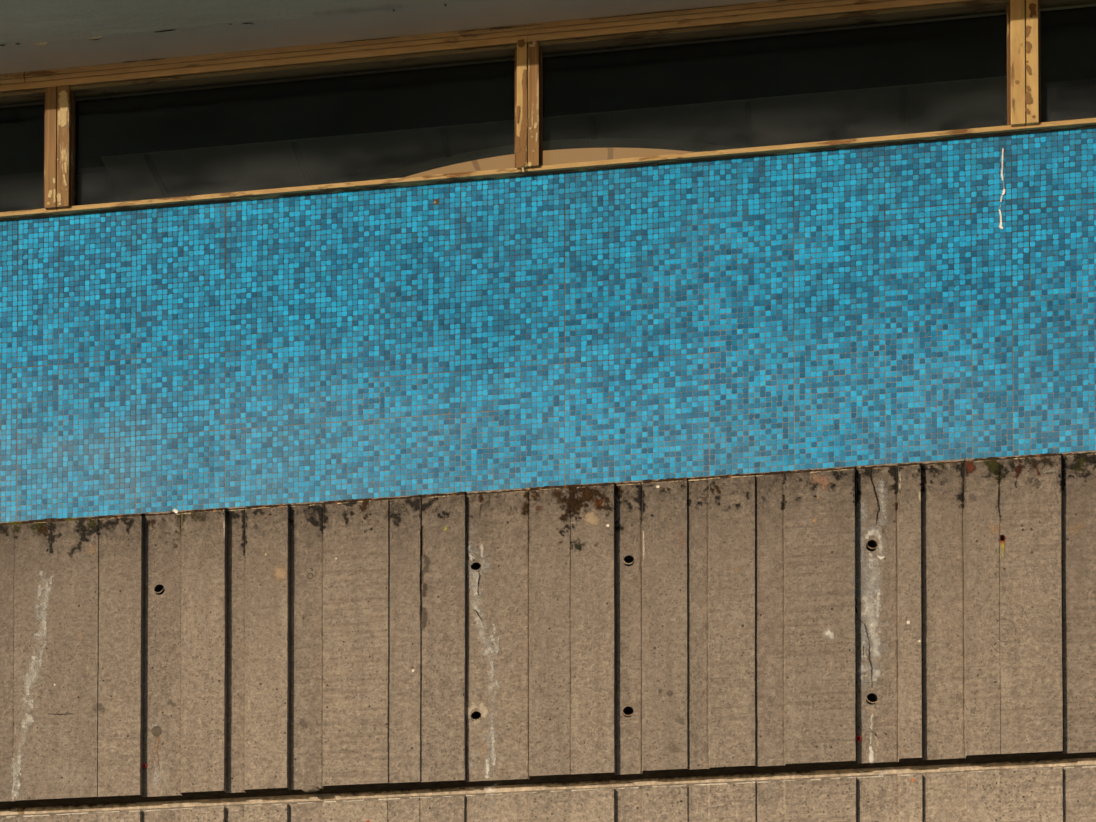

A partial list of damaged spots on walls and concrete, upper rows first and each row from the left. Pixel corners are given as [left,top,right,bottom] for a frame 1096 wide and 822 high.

water stain [0,521,56,553]
water stain [69,517,133,558]
water stain [466,545,499,689]
crack [855,595,872,686]
water stain [810,463,938,682]
crack [870,468,880,523]
water stain [11,573,52,800]
water stain [378,703,516,821]
water stain [868,714,879,763]
water stain [6,808,192,818]